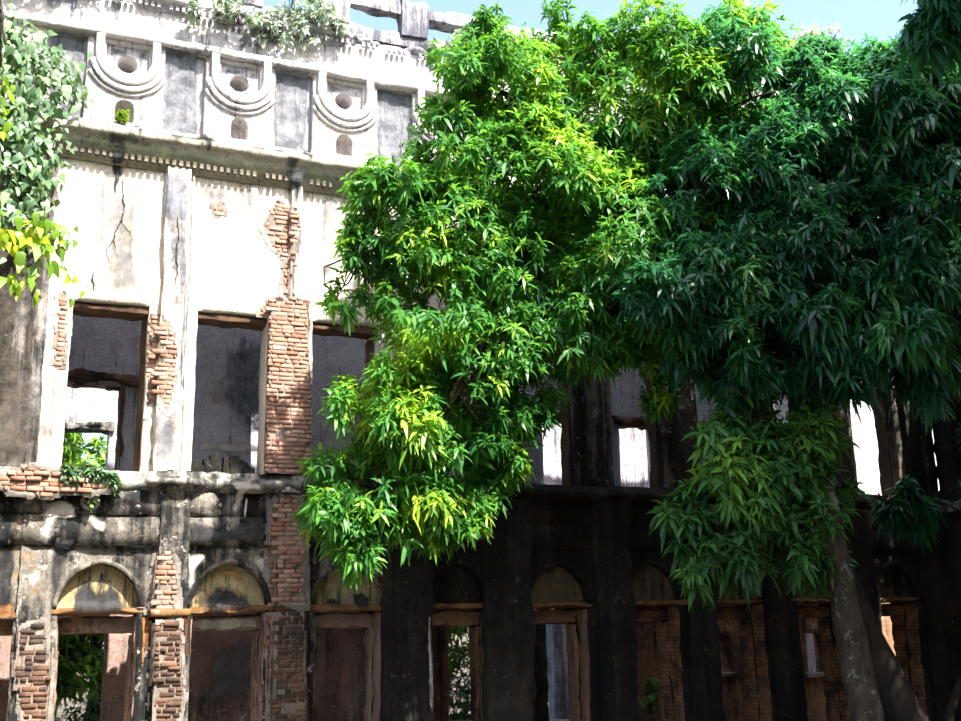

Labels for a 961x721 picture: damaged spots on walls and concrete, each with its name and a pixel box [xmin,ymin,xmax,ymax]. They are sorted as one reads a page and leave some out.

water stain [50,32,135,288]
crack [87,178,134,290]
water stain [0,240,56,464]
flaking render [51,288,73,369]
flaking render [143,312,181,420]
water stain [155,173,188,458]
flaking render [256,195,313,475]
flaking render [0,462,113,537]
water stain [75,573,124,612]
flaking render [144,487,311,721]
water stain [206,588,250,610]
flaking render [10,617,56,721]